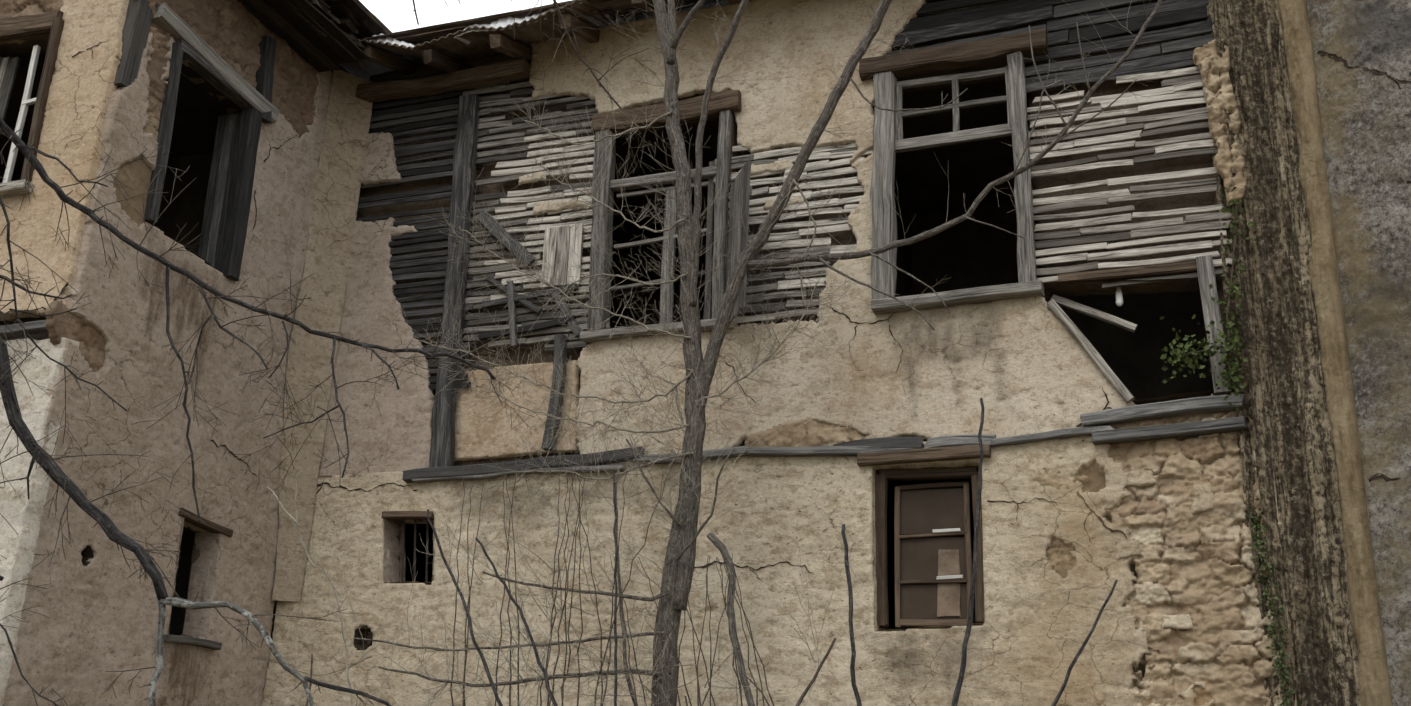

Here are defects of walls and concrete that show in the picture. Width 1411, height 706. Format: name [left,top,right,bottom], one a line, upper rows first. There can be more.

crack [1317,51,1411,89]
peeling [356,67,598,390]
peeling [713,142,873,327]
peeling [45,301,106,372]
spalling [745,416,878,466]
spalling [883,0,1393,706]